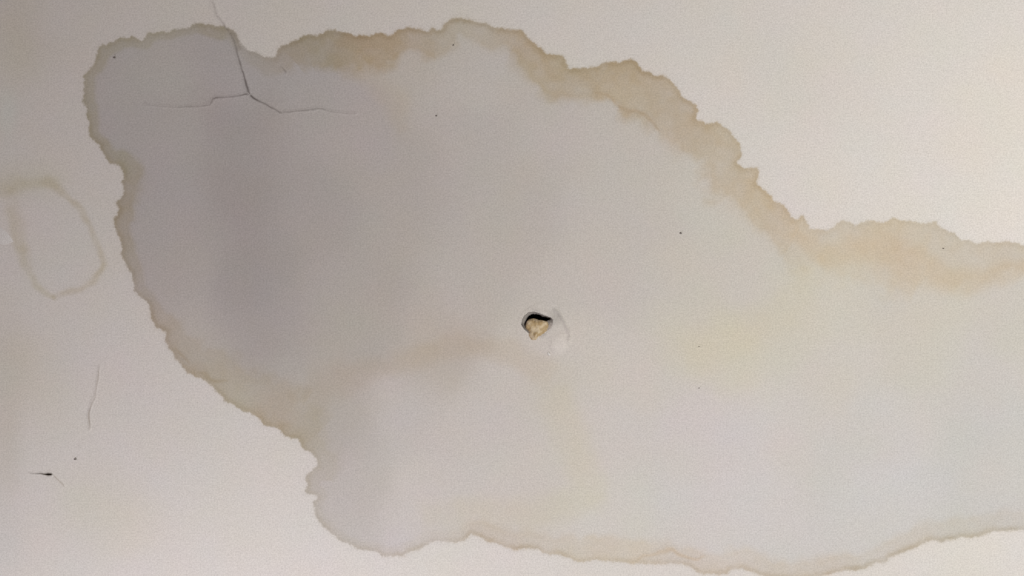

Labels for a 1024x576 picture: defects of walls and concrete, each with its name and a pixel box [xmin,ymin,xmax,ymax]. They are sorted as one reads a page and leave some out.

crack [143,0,358,116]
damp [77,18,227,286]
damp [228,13,1024,269]
damp [0,170,110,302]
damp [130,283,347,464]
damp [219,126,293,400]
damp [285,325,537,422]
spalling [516,302,577,359]
damp [653,242,829,387]
damp [776,218,1024,310]
damp [299,355,1024,576]